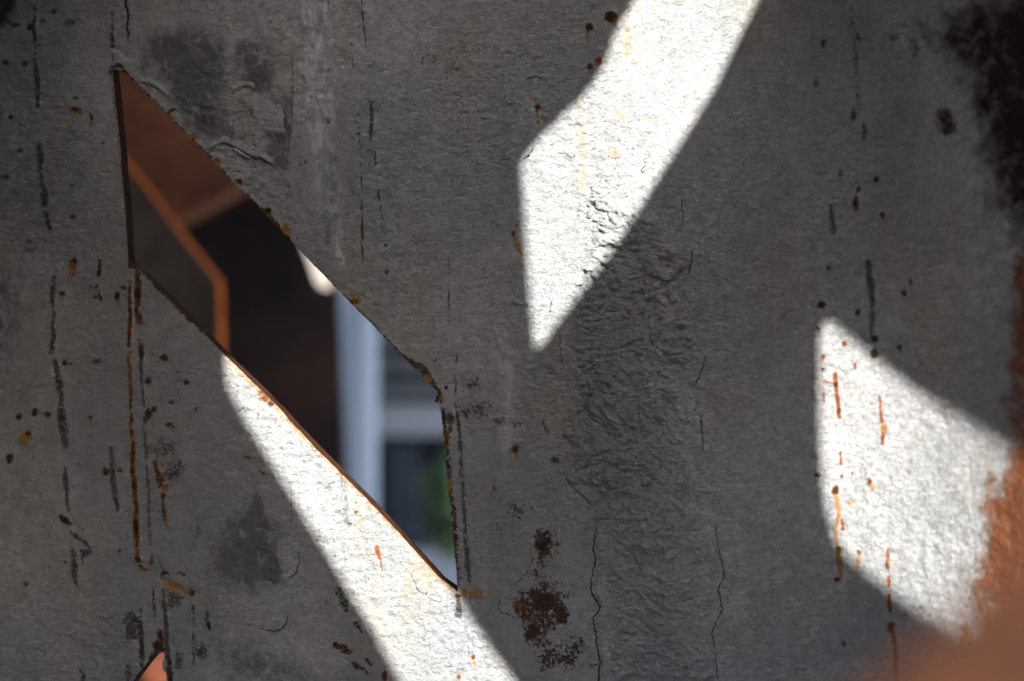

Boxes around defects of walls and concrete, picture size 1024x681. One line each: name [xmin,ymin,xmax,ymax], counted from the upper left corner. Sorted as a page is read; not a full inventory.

water stain [146,29,272,139]
water stain [266,102,290,168]
corrosion [585,11,618,41]
corrosion [114,260,205,571]
corrosion [241,373,361,525]
corrosion [310,261,486,597]
corrosion [821,354,842,419]
corrosion [878,395,887,445]
corrosion [498,528,590,672]
crack [565,472,632,681]
corrosion [831,451,854,582]
corrosion [886,547,898,669]